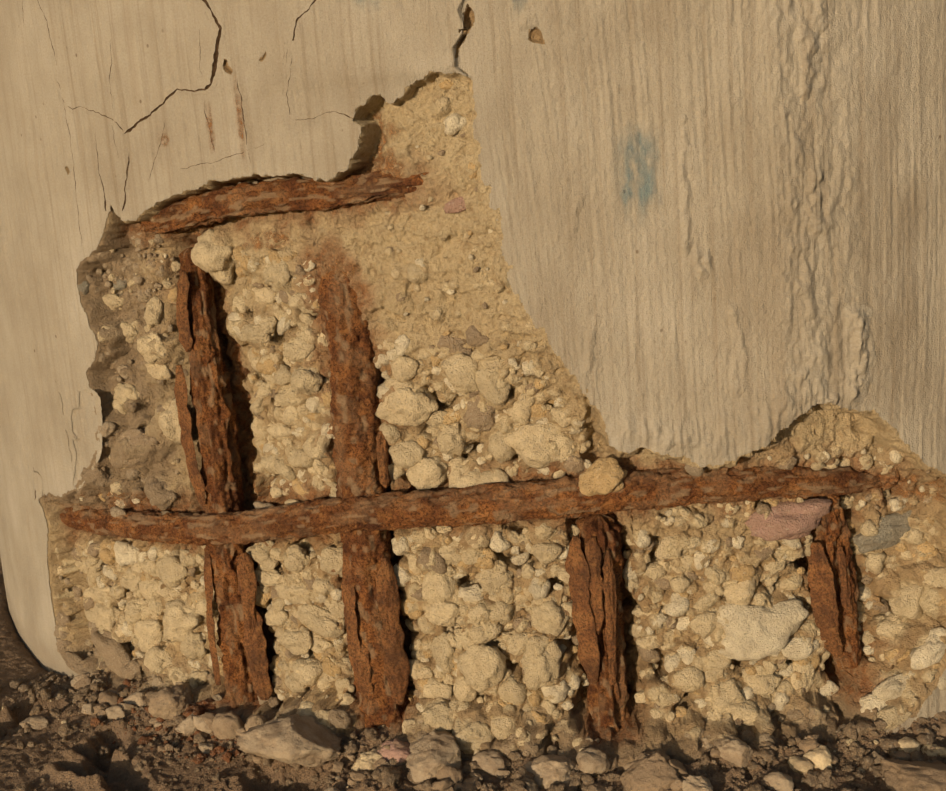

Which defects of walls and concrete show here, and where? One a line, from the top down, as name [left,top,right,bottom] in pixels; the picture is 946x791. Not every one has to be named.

crack [20,0,60,67]
crack [58,0,356,213]
rust [140,115,429,234]
rust [60,247,945,732]
spalling [246,532,344,617]
spalling [131,636,215,692]
spalling [190,631,366,744]
spalling [256,603,329,693]
spalling [291,604,346,638]
spalling [383,678,438,743]
spalling [398,581,455,688]
spalling [423,669,464,699]